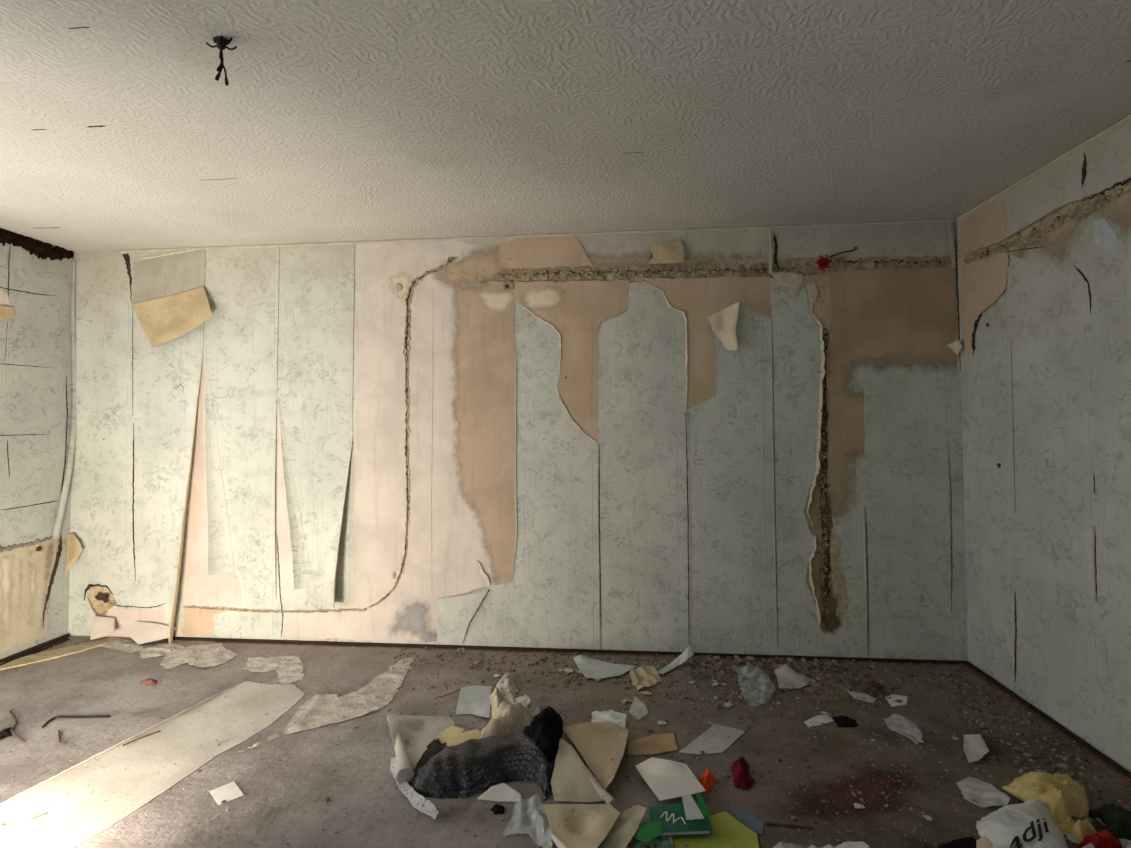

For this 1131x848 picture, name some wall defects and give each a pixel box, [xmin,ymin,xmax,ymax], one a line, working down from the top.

flaking render [0,289,9,305]
flaking render [132,249,205,307]
flaking render [961,228,1036,356]
flaking render [1094,218,1127,253]
flaking render [84,353,241,637]
flaking render [277,233,772,642]
flaking render [803,274,849,626]